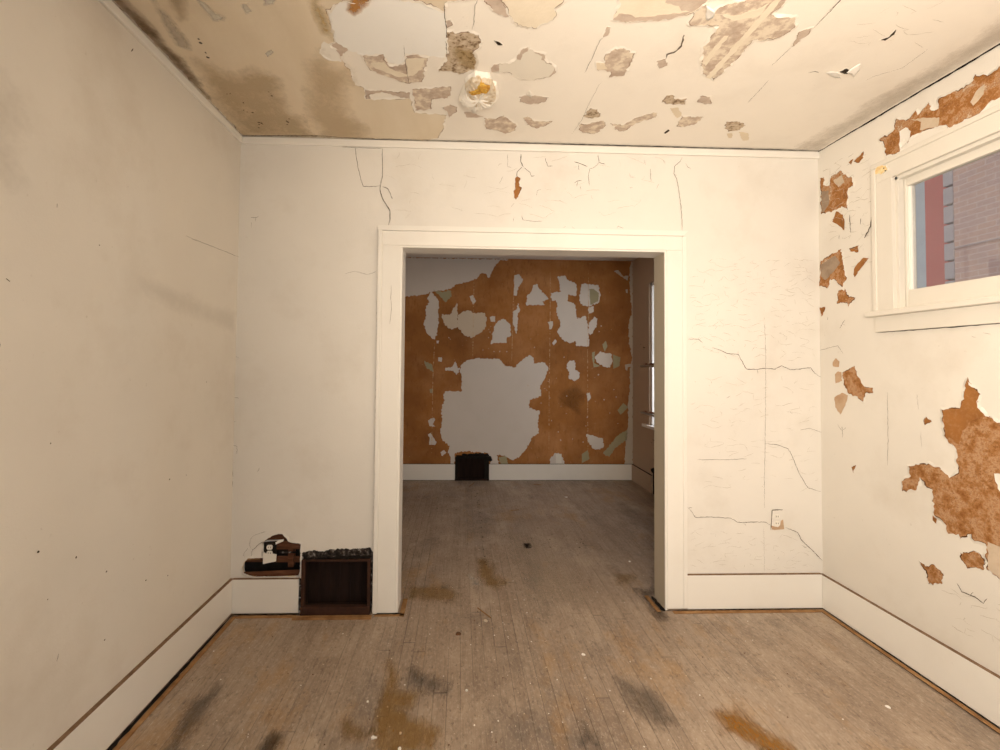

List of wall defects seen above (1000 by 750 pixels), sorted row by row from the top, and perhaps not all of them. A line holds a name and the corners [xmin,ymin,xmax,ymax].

peeling [112,0,567,148]
peeling [594,46,637,78]
peeling [577,94,713,135]
peeling [602,0,815,81]
peeling [723,120,749,141]
peeling [878,64,1000,158]
crack [348,147,608,228]
peeling [819,151,865,230]
peeling [819,244,869,317]
peeling [833,358,875,414]
peeling [900,375,1000,582]
peeling [918,560,946,587]